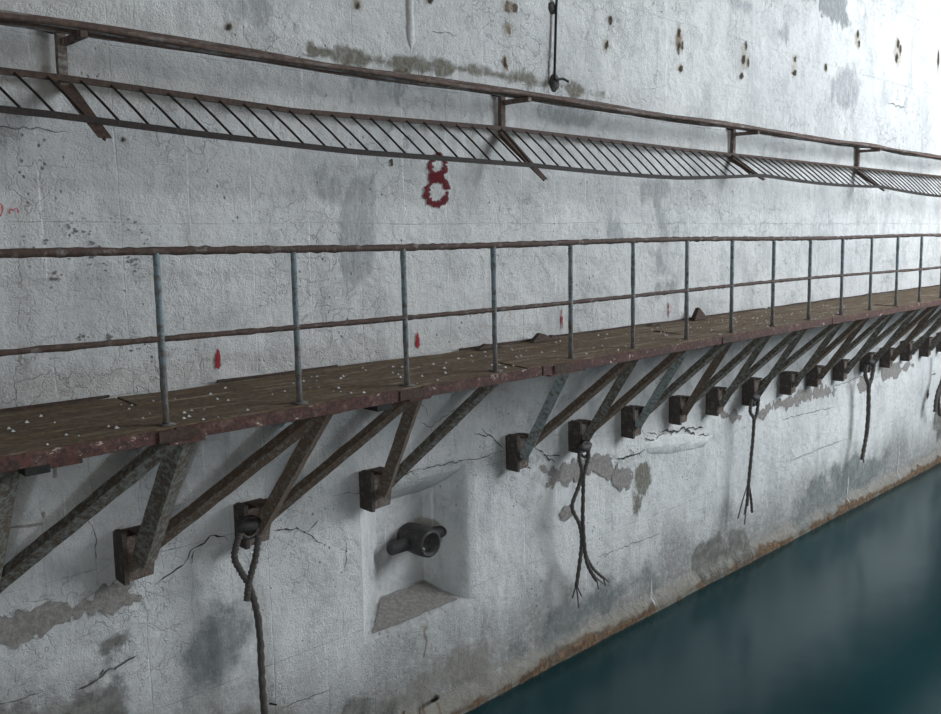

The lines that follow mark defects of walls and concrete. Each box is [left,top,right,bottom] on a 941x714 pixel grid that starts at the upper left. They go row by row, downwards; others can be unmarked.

peeling [819,0,849,28]
crack [617,426,708,460]
spalling [540,453,633,492]
spalling [559,505,573,521]
damp [691,446,941,590]
crack [154,535,227,586]
crack [276,522,347,565]
spalling [0,580,142,650]
damp [373,581,457,633]
damp [453,556,656,714]
crack [76,653,142,691]
damp [67,674,128,714]